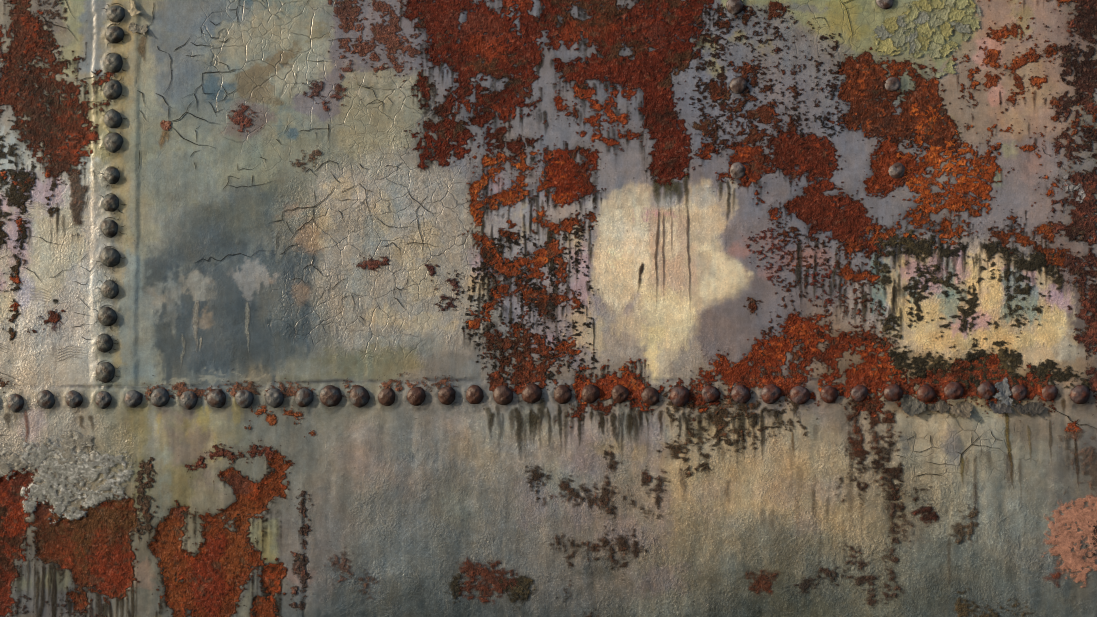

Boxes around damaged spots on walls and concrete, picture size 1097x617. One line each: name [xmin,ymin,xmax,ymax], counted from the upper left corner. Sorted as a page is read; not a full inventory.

rust [0,0,114,344]
rust [227,103,262,132]
crack [195,124,436,322]
crack [356,77,393,113]
rust [302,0,1097,606]
peeling [872,0,981,78]
peeling [0,430,133,524]
rust [0,369,318,617]